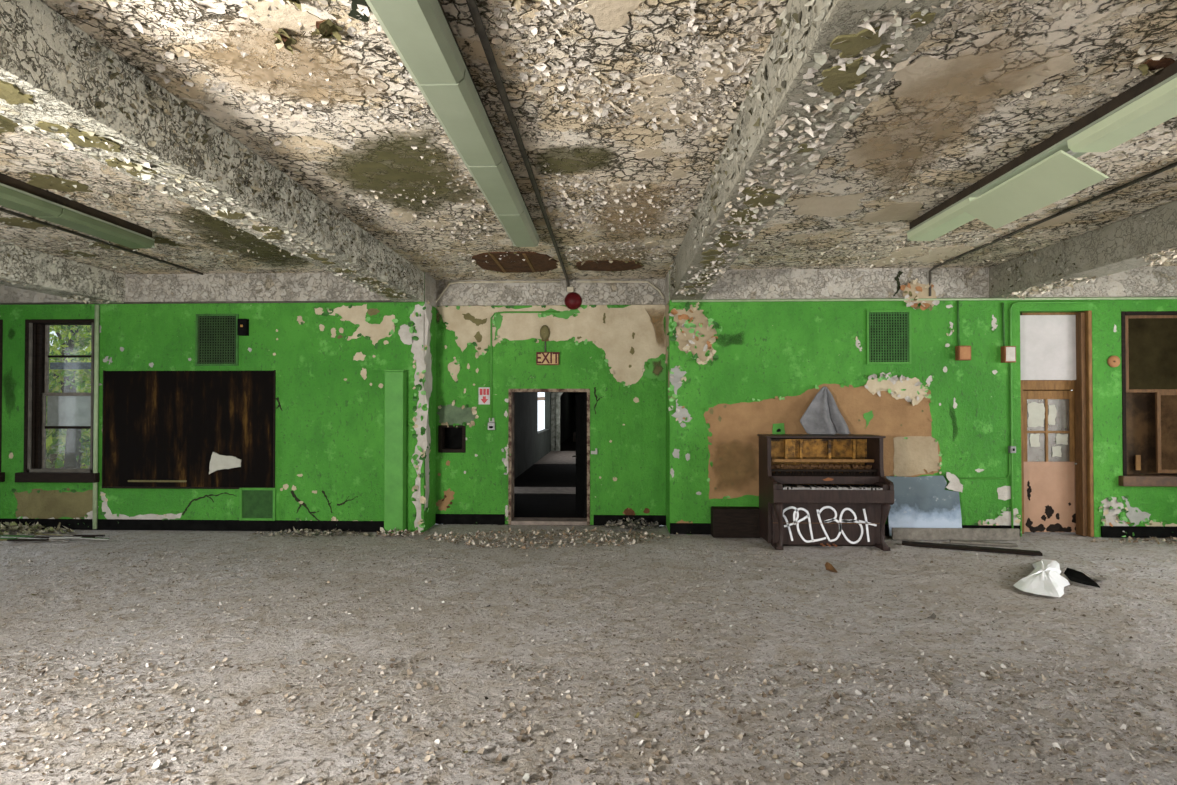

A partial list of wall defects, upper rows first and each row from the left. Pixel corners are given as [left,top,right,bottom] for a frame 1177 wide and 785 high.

crack [348,0,369,22]
leakage [326,133,477,211]
leakage [535,147,612,175]
leakage [174,208,310,267]
peeling [0,0,1177,537]